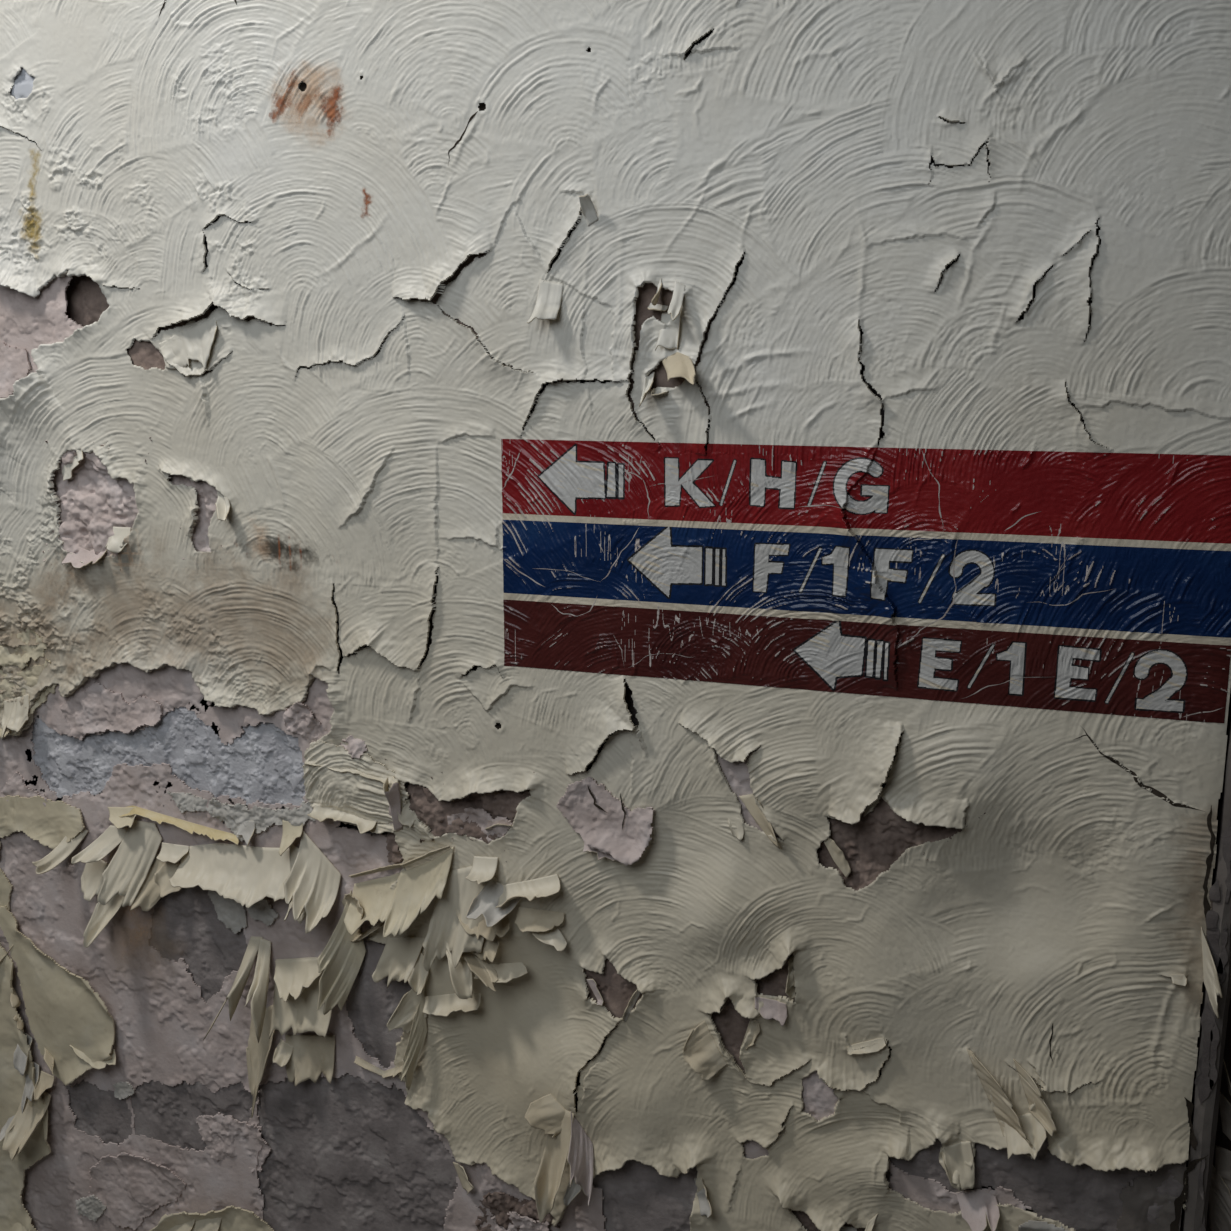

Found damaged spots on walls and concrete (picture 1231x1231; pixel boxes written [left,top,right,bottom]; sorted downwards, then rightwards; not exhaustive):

rust [269,74,341,132]
crack [448,111,478,163]
peeling [0,245,237,584]
peeling [122,203,287,426]
peeling [392,181,746,445]
peeling [838,315,937,447]
peeling [1007,212,1101,343]
crack [504,471,711,616]
crack [906,449,958,645]
crack [1027,554,1112,606]
peeling [0,422,1231,1231]
crack [1073,730,1216,917]